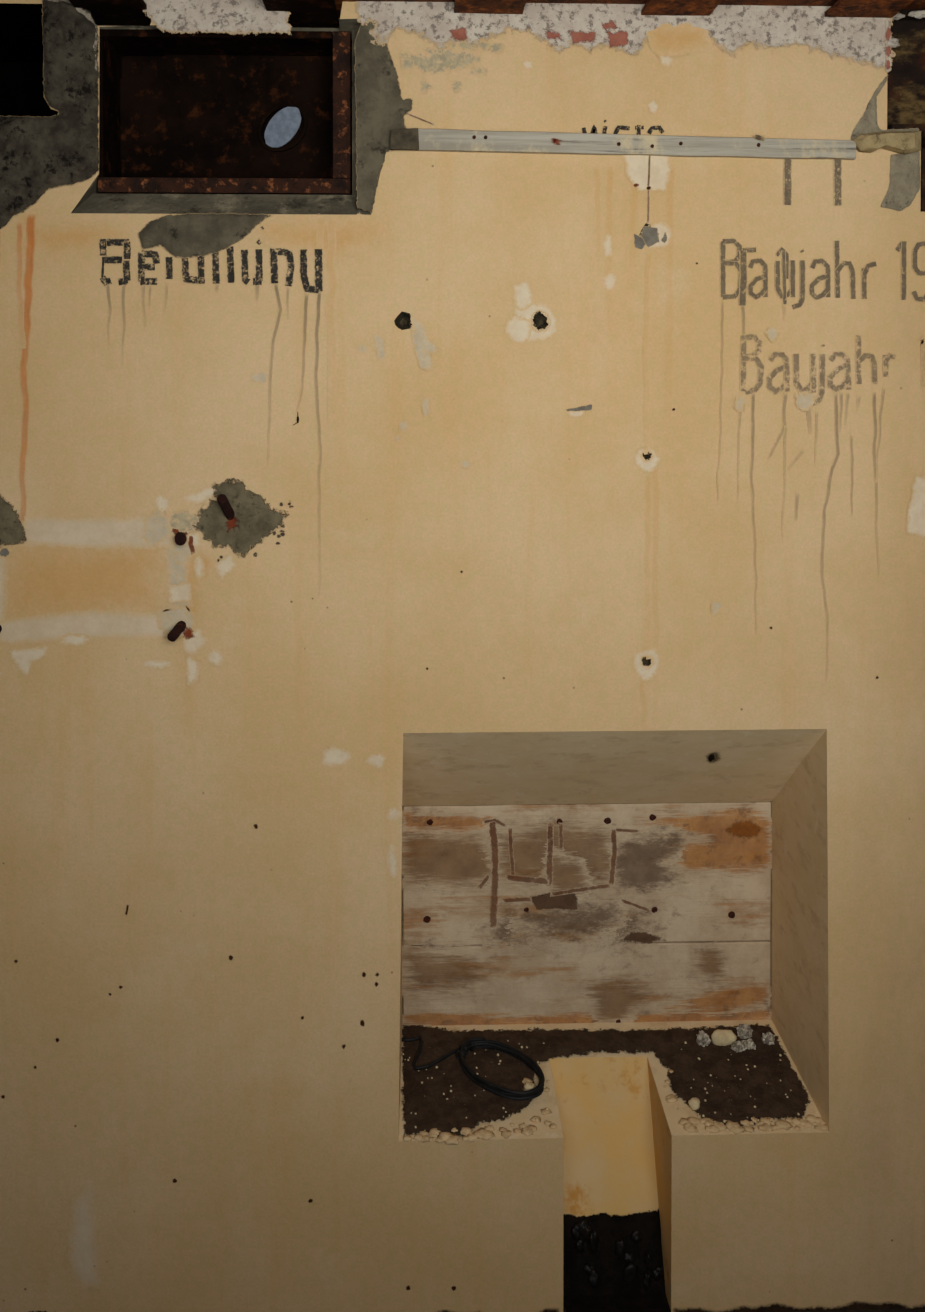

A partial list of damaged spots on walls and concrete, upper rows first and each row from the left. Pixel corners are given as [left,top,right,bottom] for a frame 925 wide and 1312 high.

spalling [0,0,100,229]
flaking render [354,1,896,73]
flaking render [0,495,27,557]
corrosion [0,213,129,524]
flaking render [141,478,294,581]
leakage [255,283,322,600]
leakage [717,301,818,635]
leakage [821,388,886,682]
peeling [905,472,925,538]